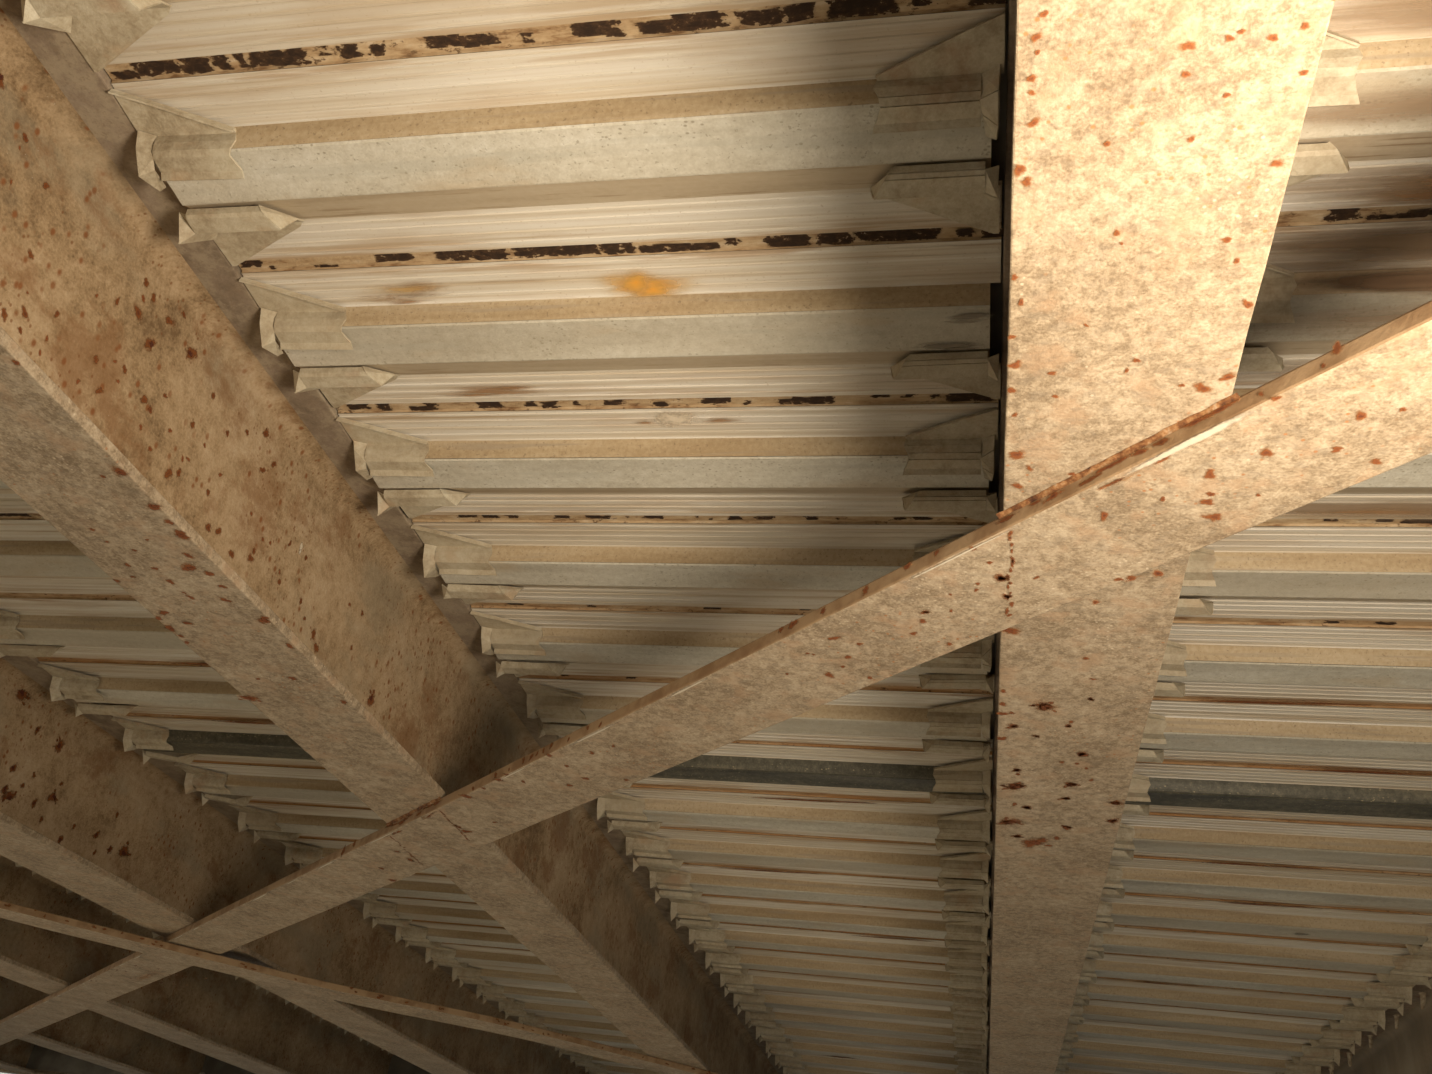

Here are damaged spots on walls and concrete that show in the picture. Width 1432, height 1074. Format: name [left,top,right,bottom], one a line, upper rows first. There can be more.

corrosion [1031,10,1049,55]
corrosion [2,291,29,334]
corrosion [115,278,156,320]
corrosion [612,276,679,296]
corrosion [458,387,529,396]
corrosion [164,455,190,478]
corrosion [974,373,1243,635]
corrosion [148,504,232,603]
corrosion [1030,702,1073,727]
corrosion [1,764,63,822]
corrosion [999,768,1071,848]
corrosion [92,830,131,857]